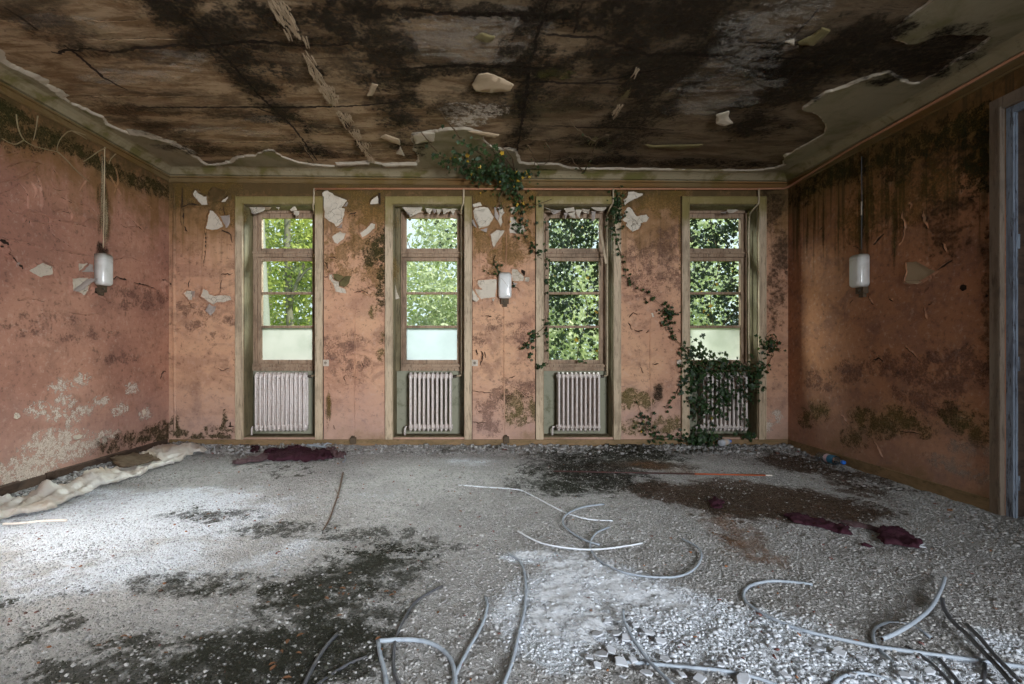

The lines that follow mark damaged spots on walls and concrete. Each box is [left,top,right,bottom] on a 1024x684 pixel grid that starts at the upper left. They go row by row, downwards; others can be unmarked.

water stain [0,1,156,61]
crack [51,31,410,163]
water stain [90,0,990,168]
water stain [0,97,247,242]
peeling [191,186,232,232]
peeling [320,190,377,246]
peeling [472,202,527,250]
peeling [621,190,650,234]
water stain [763,100,991,328]
peeling [0,239,109,302]
peeling [472,267,529,302]
water stain [0,373,151,486]